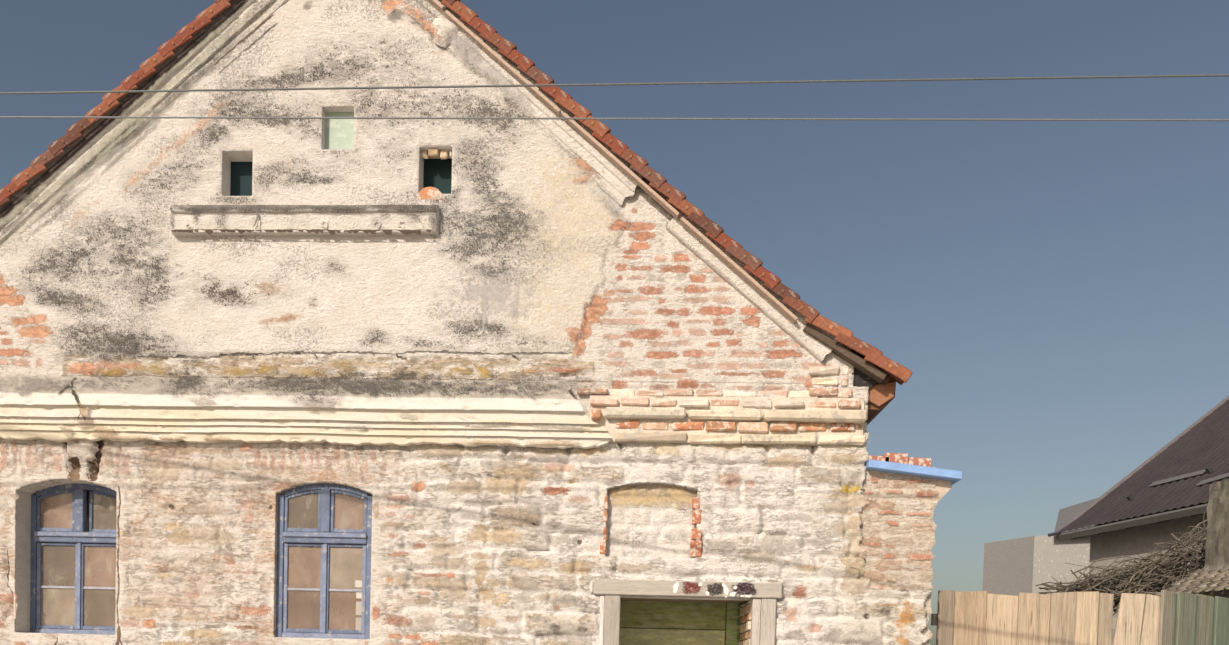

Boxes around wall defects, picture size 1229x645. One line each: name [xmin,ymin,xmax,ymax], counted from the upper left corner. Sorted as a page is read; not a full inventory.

leakage [0,31,608,405]
spalling [0,275,53,367]
spalling [523,208,829,391]
crack [57,378,104,461]
peeling [53,403,286,485]
crack [114,485,122,645]
peeling [153,500,260,598]
peeling [163,604,270,645]
peeling [372,422,607,645]
peeling [612,563,658,573]
peeling [650,443,936,619]
spalling [784,586,864,645]